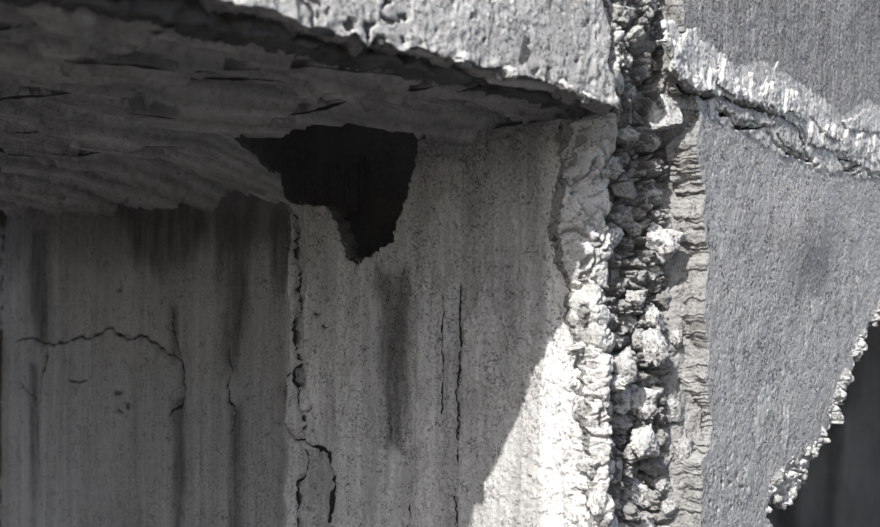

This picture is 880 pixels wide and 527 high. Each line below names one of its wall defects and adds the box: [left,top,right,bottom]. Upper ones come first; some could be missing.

crack [675,84,760,131]
crack [341,240,359,269]
spalling [547,0,880,527]
crack [19,319,187,416]
crack [285,210,336,527]
crack [441,286,463,462]